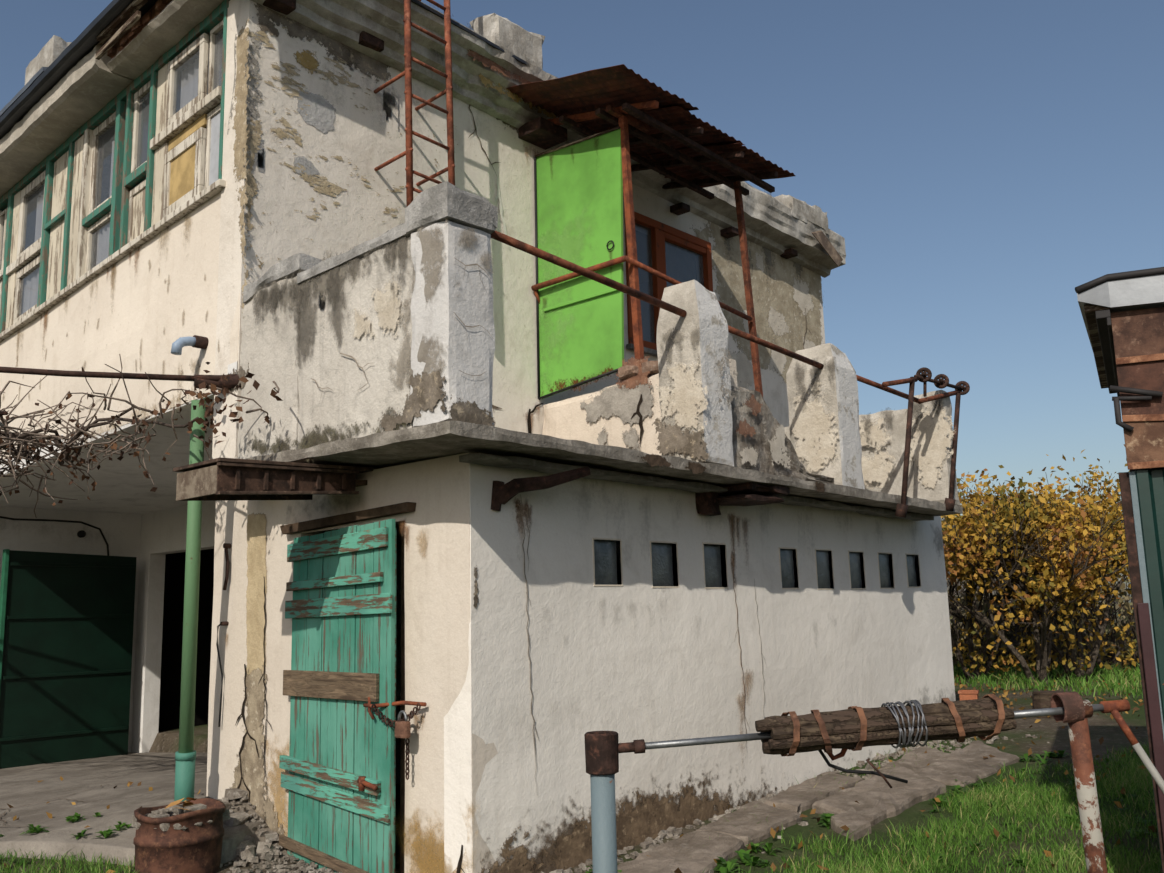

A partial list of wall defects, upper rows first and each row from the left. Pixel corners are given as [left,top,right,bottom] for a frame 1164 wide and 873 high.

spalling [221,3,405,313]
damp [253,223,411,366]
spalling [377,299,496,432]
crack [631,394,643,444]
spalling [580,356,709,474]
peeling [689,221,824,467]
peeling [906,405,955,488]
crack [235,581,273,801]
spalling [231,513,284,837]
crack [520,494,539,796]
crack [732,523,766,748]
damp [395,821,462,873]